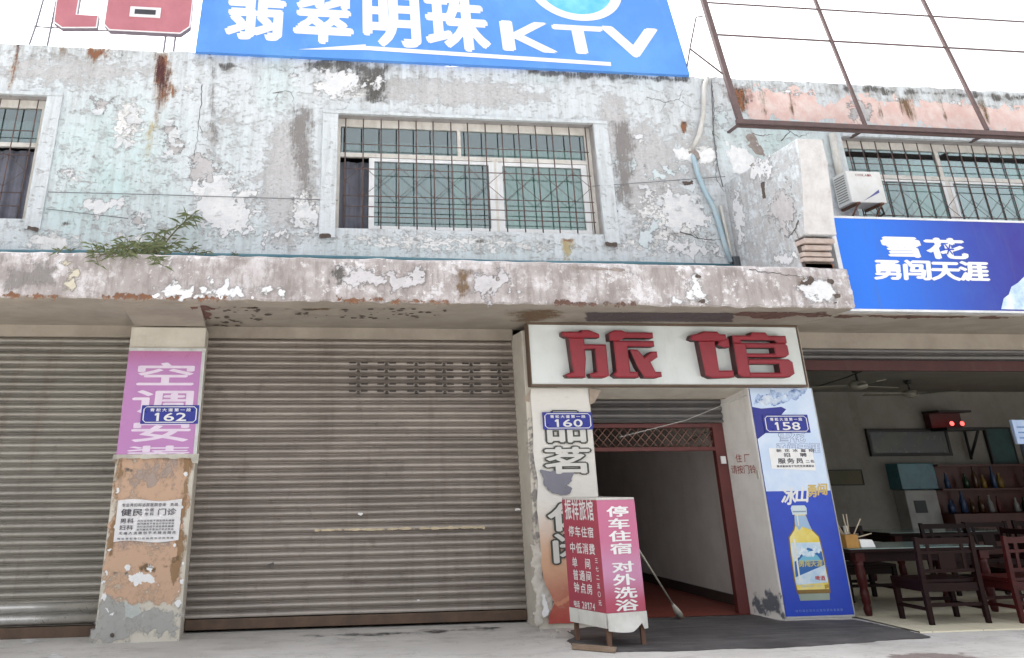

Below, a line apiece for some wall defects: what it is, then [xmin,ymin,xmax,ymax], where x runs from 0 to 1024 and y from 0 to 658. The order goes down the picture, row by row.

rust [87,47,109,62]
rust [154,55,176,105]
water stain [305,59,388,103]
rust [735,88,751,111]
rust [899,98,913,118]
water stain [290,108,315,196]
peeling [157,119,331,251]
peeling [613,132,775,304]
peeling [102,276,286,327]
peeling [295,264,449,319]
spalling [731,238,966,319]
peeling [90,458,193,644]